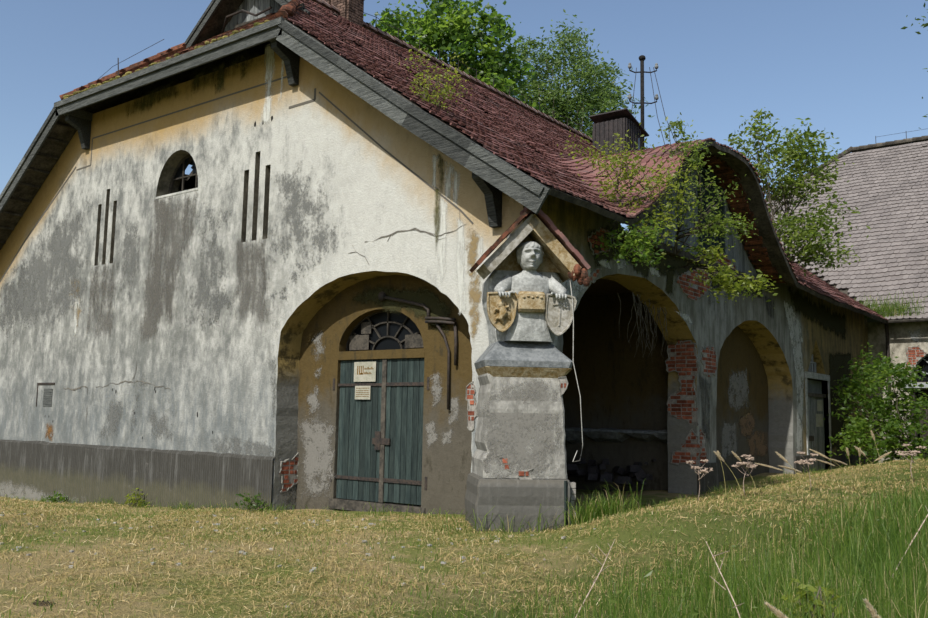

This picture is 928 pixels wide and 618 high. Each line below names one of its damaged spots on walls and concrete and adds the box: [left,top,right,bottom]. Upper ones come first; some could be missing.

damp [0,167,336,339]
crack [348,210,465,264]
damp [432,155,483,312]
peeling [563,259,627,298]
flaking render [676,253,737,301]
peeling [278,332,335,510]
flaking render [665,340,717,467]
peeling [728,369,749,412]